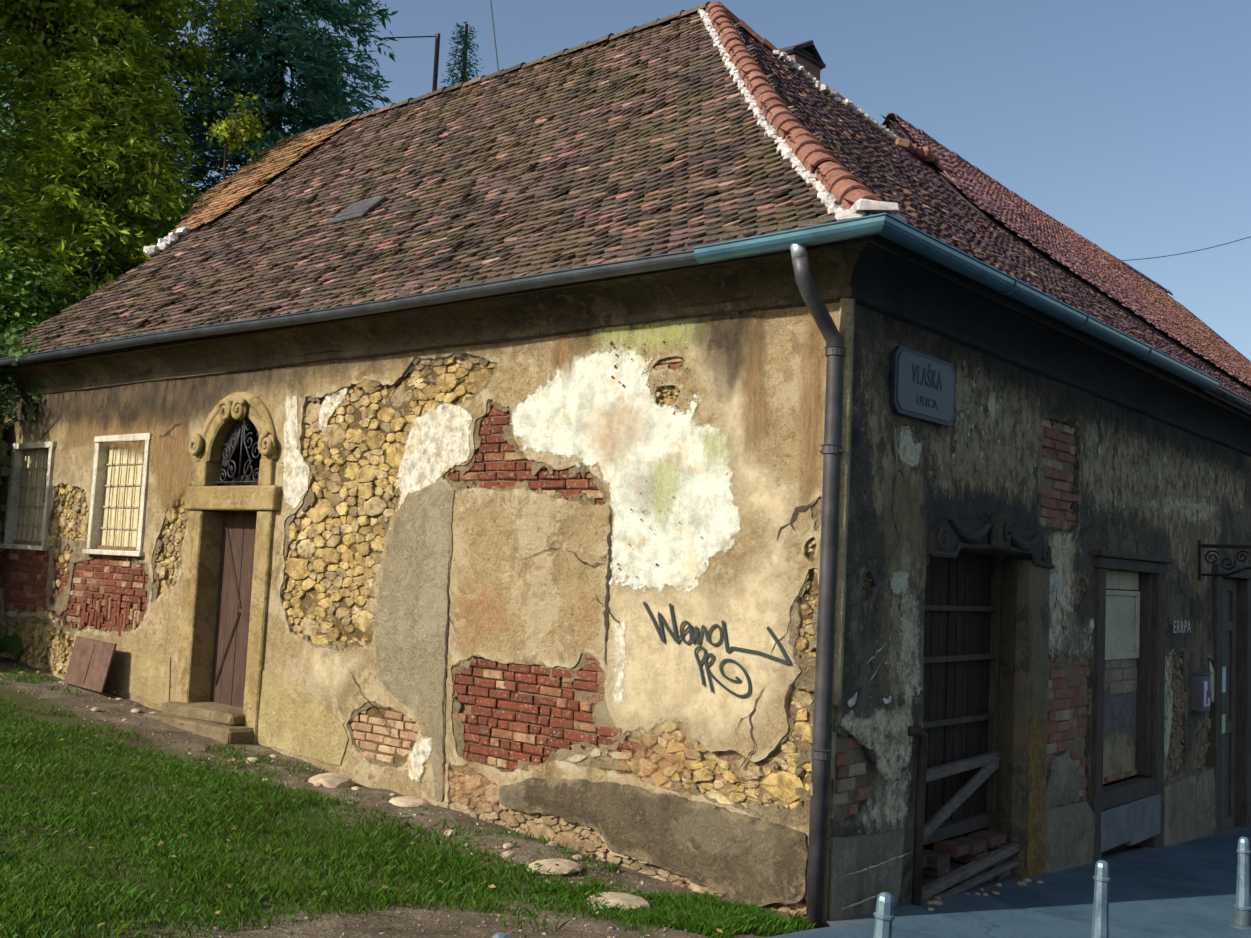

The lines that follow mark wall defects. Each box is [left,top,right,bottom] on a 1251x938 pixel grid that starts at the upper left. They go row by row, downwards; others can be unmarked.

spalling [0,483,193,675]
peeling [281,341,1245,897]
crack [777,500,815,541]
damp [1104,689,1137,745]